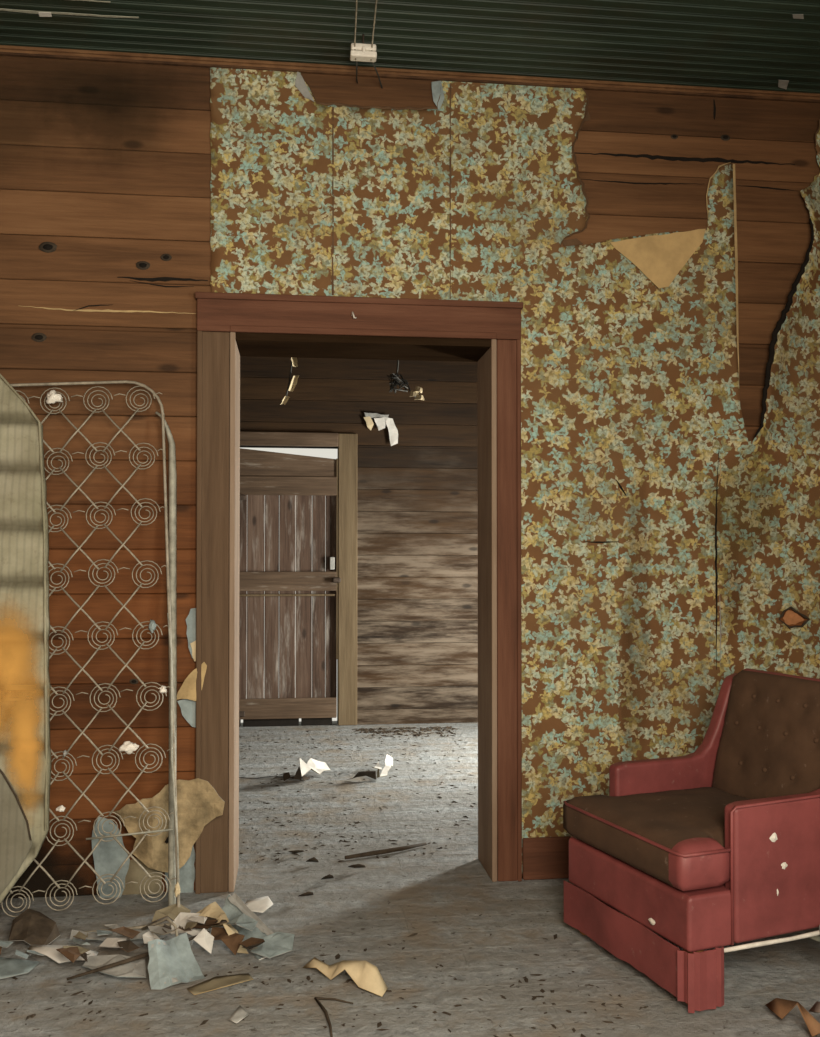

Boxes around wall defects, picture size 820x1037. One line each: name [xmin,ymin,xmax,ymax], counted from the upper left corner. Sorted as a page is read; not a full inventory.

crack [577,153,795,191]